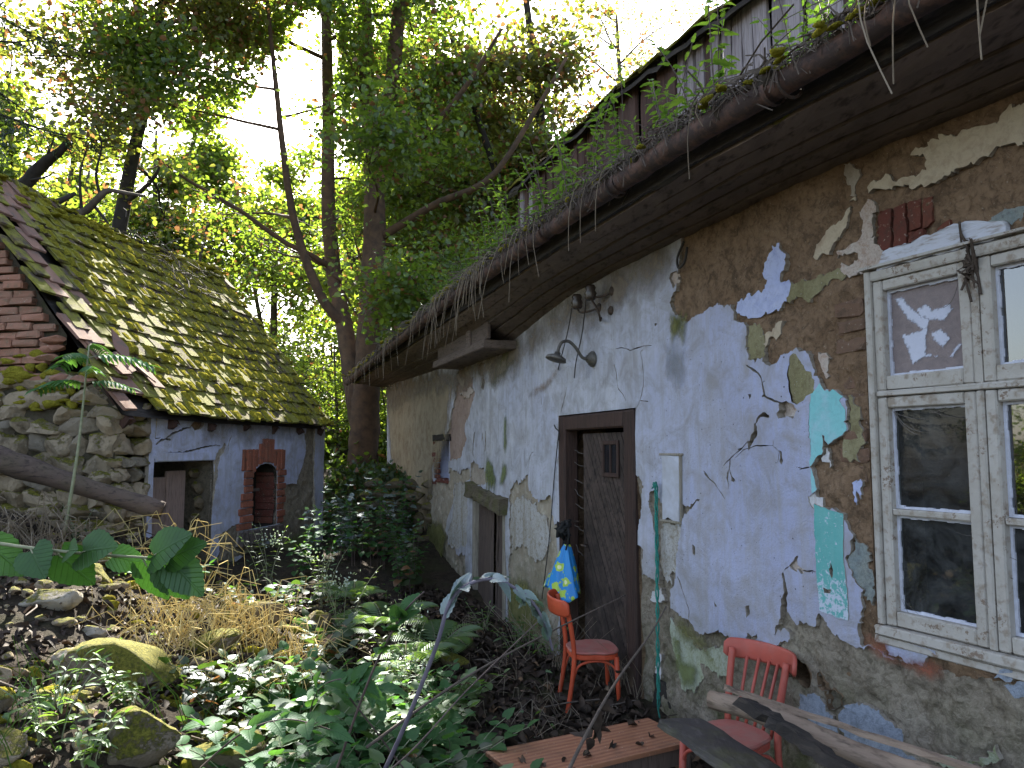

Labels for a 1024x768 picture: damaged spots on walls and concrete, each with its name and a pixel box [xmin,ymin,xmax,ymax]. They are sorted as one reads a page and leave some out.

crack [155,427,214,452]
spalling [425,369,488,577]
spalling [510,475,559,651]
spalling [637,90,1024,768]